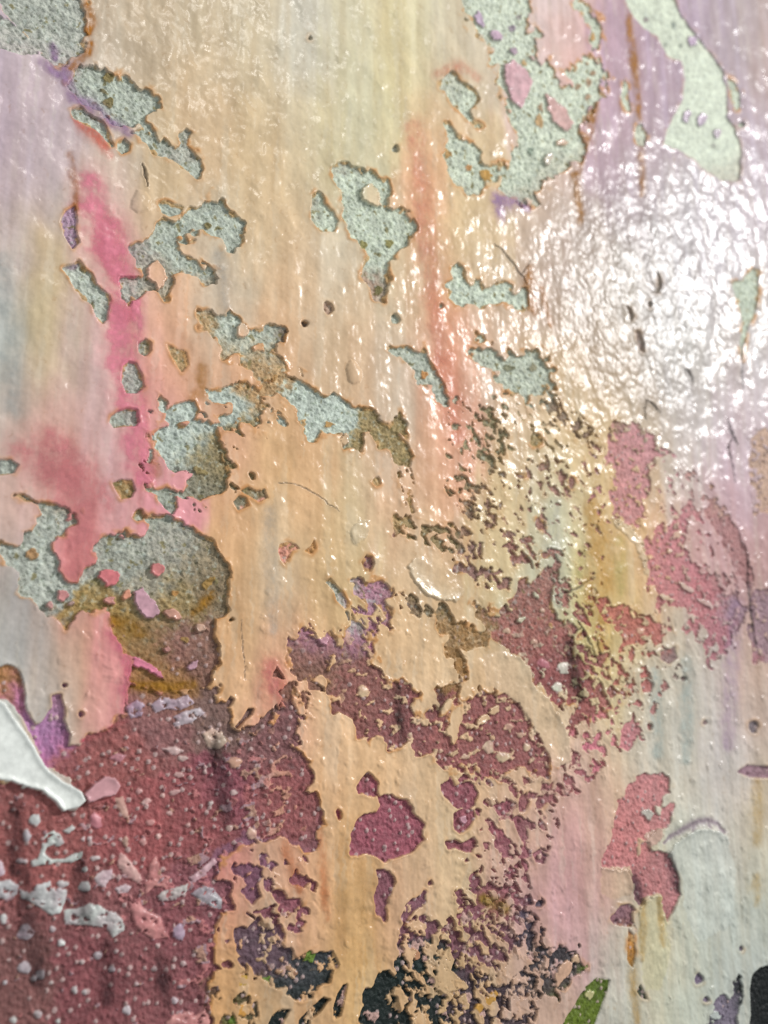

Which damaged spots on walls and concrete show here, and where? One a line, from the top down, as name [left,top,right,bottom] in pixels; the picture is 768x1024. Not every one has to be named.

peeling [0,0,248,326]
peeling [310,159,420,324]
peeling [438,0,650,210]
peeling [624,0,746,184]
peeling [0,305,768,1024]